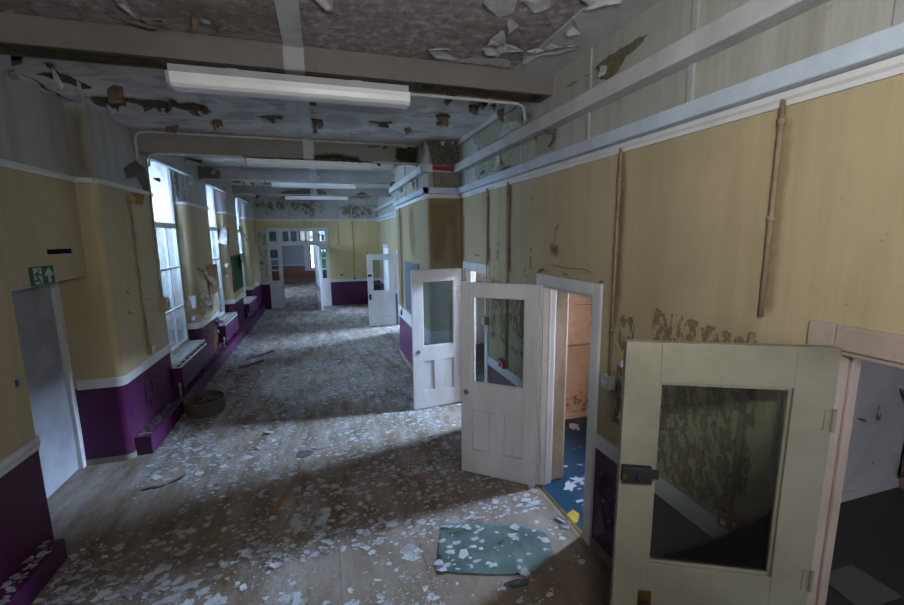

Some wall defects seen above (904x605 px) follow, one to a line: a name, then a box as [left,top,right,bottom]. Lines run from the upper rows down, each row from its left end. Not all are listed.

peeling [315,0,333,11]
peeling [581,0,623,11]
crack [19,73,72,101]
peeling [36,62,223,131]
peeling [310,102,324,134]
peeling [565,35,647,87]
peeling [124,160,161,191]
peeling [280,189,327,199]
peeling [217,225,271,277]
peeling [611,315,634,426]
peeling [34,263,588,605]
peeling [0,540,51,605]